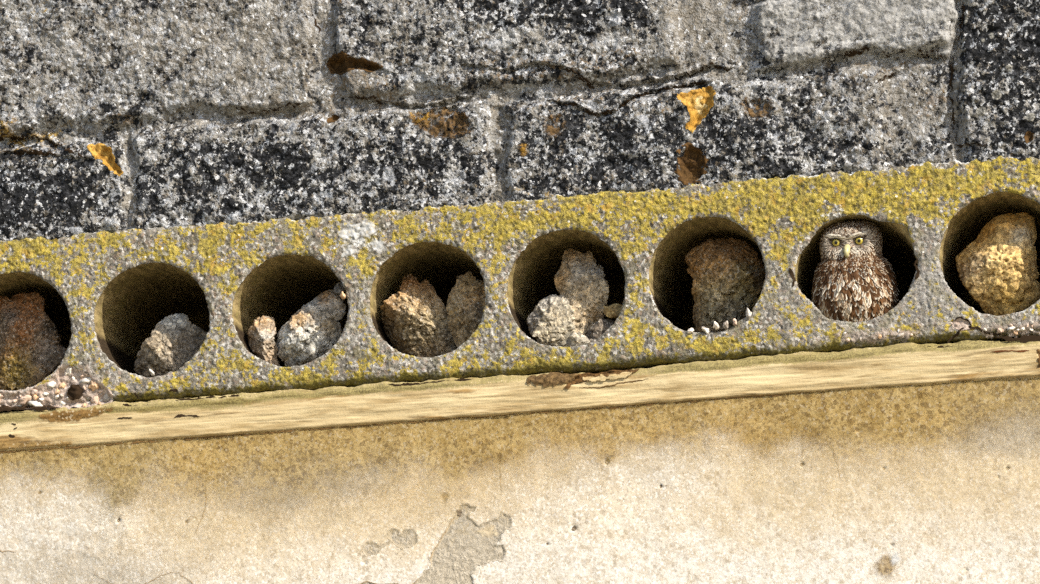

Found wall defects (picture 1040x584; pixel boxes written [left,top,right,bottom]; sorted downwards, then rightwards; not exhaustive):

crack [354,95,409,107]
crack [548,62,731,116]
spalling [0,364,114,410]
water stain [0,377,1040,505]
peeling [362,528,418,556]
peeling [414,503,512,584]